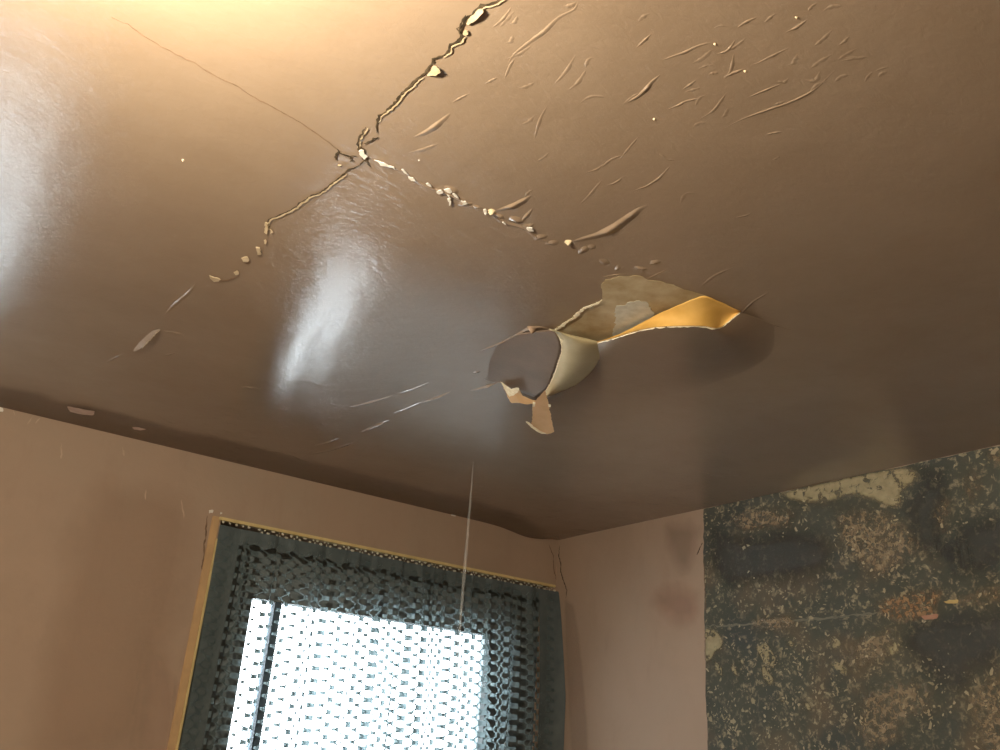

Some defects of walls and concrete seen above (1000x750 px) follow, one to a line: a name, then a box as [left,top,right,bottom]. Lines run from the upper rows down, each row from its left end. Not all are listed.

crack [113,0,504,314]
peeling [134,329,186,351]
leakage [703,446,1000,750]